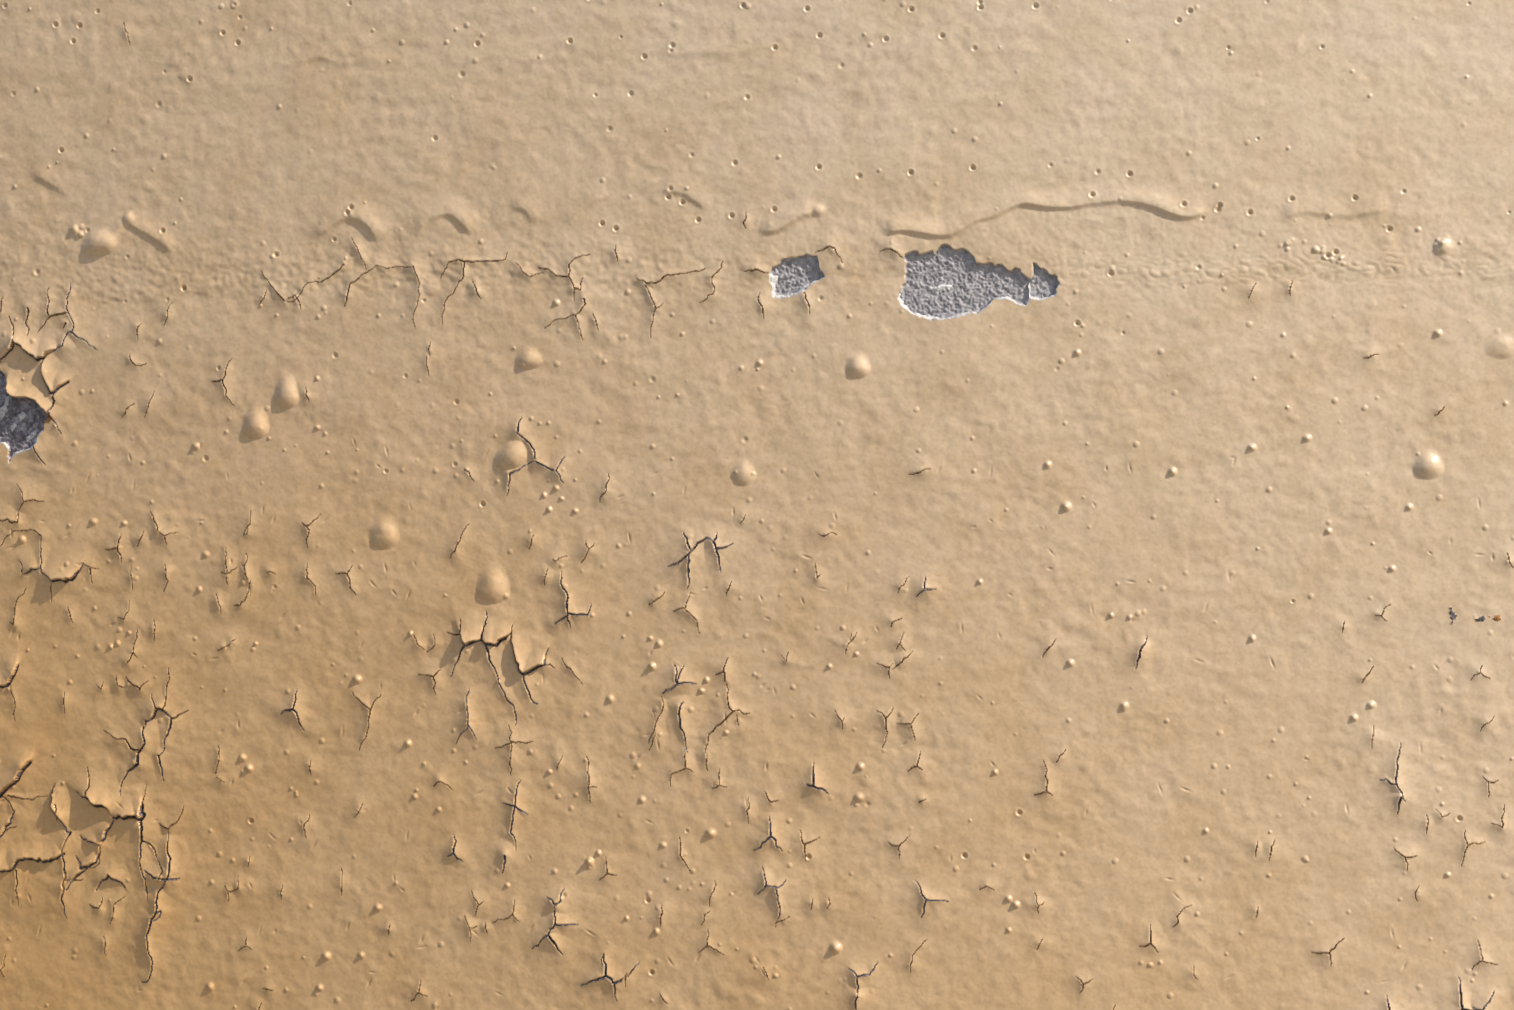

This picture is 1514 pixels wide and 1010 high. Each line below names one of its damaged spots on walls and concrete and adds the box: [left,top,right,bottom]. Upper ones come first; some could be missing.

peeling [0,283,98,466]
crack [257,209,772,379]
spalling [769,254,826,299]
crack [812,243,905,266]
spalling [898,244,1061,321]
crack [0,481,47,526]
crack [61,508,181,716]
crack [461,414,612,688]
crack [408,631,772,1007]
crack [646,512,833,930]
crack [832,573,1047,1010]
crack [1031,747,1069,799]